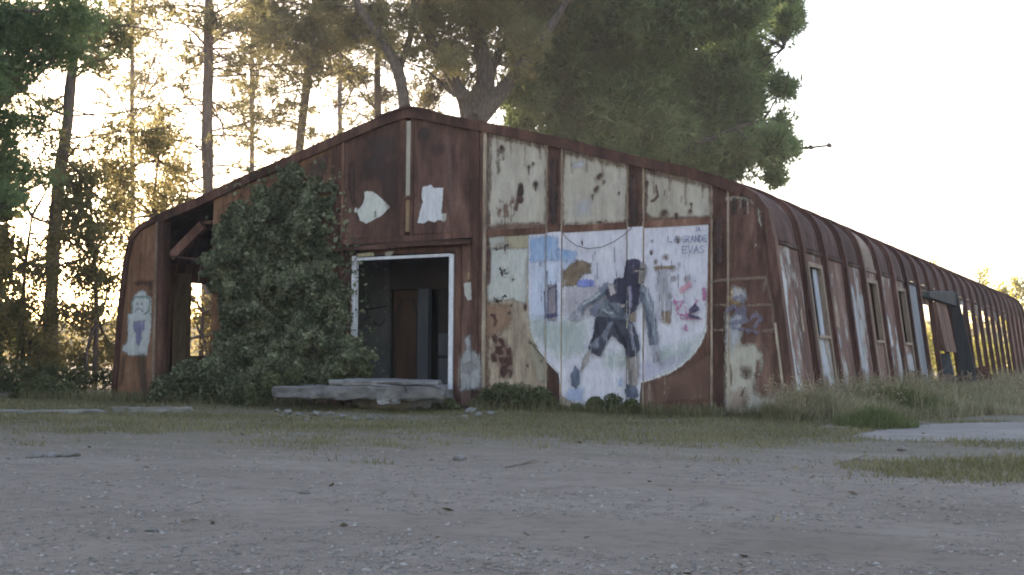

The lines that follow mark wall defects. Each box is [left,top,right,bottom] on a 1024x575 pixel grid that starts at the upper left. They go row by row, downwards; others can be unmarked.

corrosion [485,134,724,389]
peeling [725,314,779,413]
peeling [782,268,804,390]
peeling [819,296,841,376]
peeling [851,287,868,373]